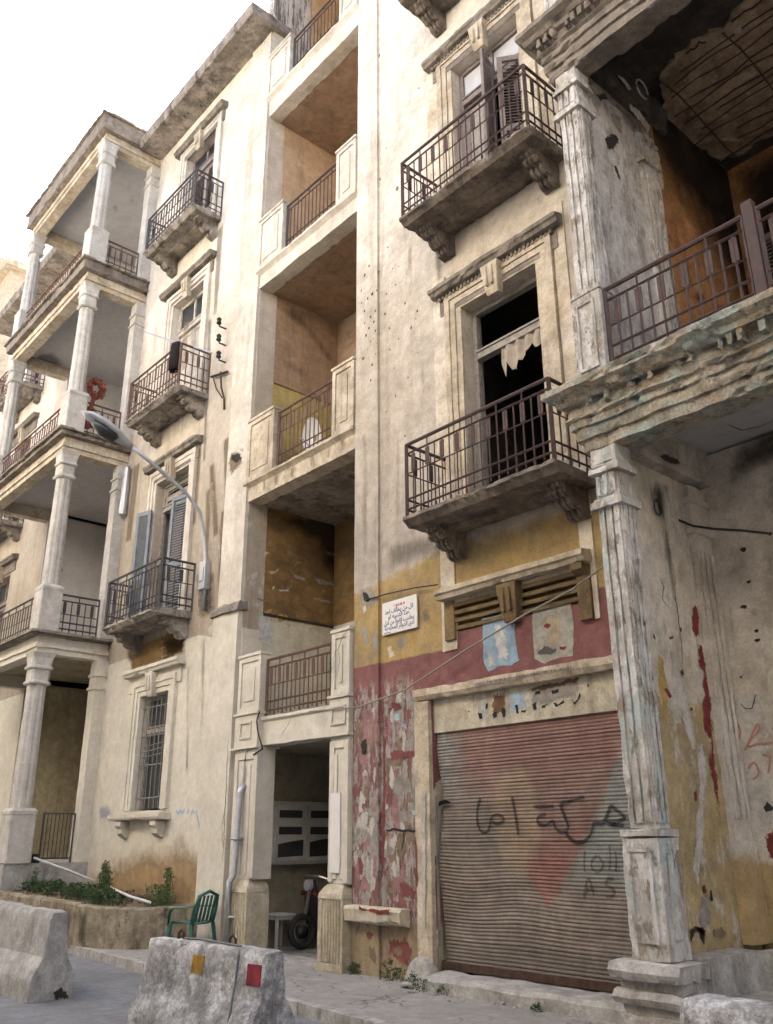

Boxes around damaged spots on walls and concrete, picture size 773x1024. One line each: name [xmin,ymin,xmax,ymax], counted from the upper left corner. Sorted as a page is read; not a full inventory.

spalling [658,0,773,161]
peeling [353,677,426,966]
peeling [656,603,726,945]
peeling [745,770,773,859]